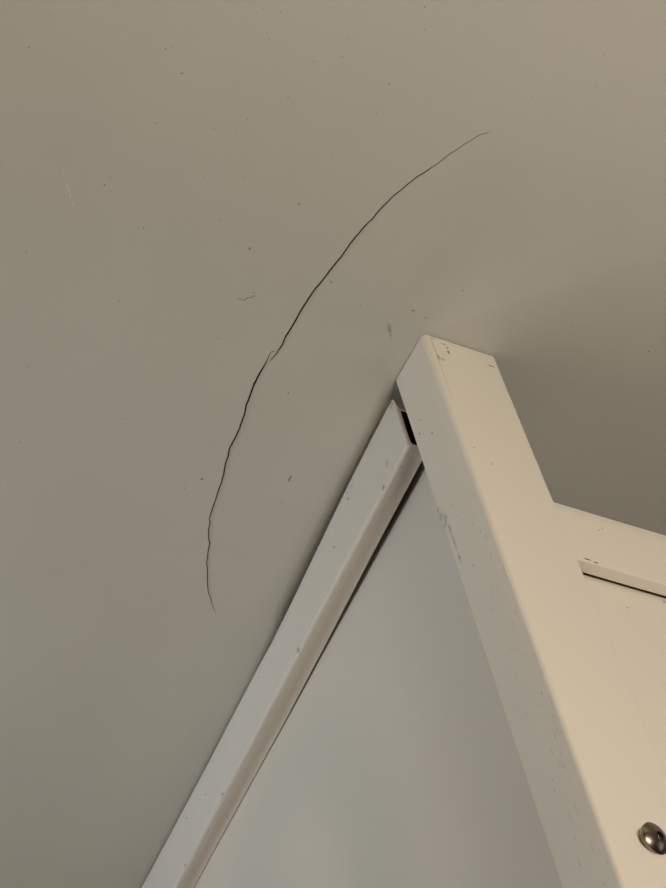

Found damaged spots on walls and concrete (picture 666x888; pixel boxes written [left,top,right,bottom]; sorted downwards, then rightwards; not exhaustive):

crack [206,132,489,611]